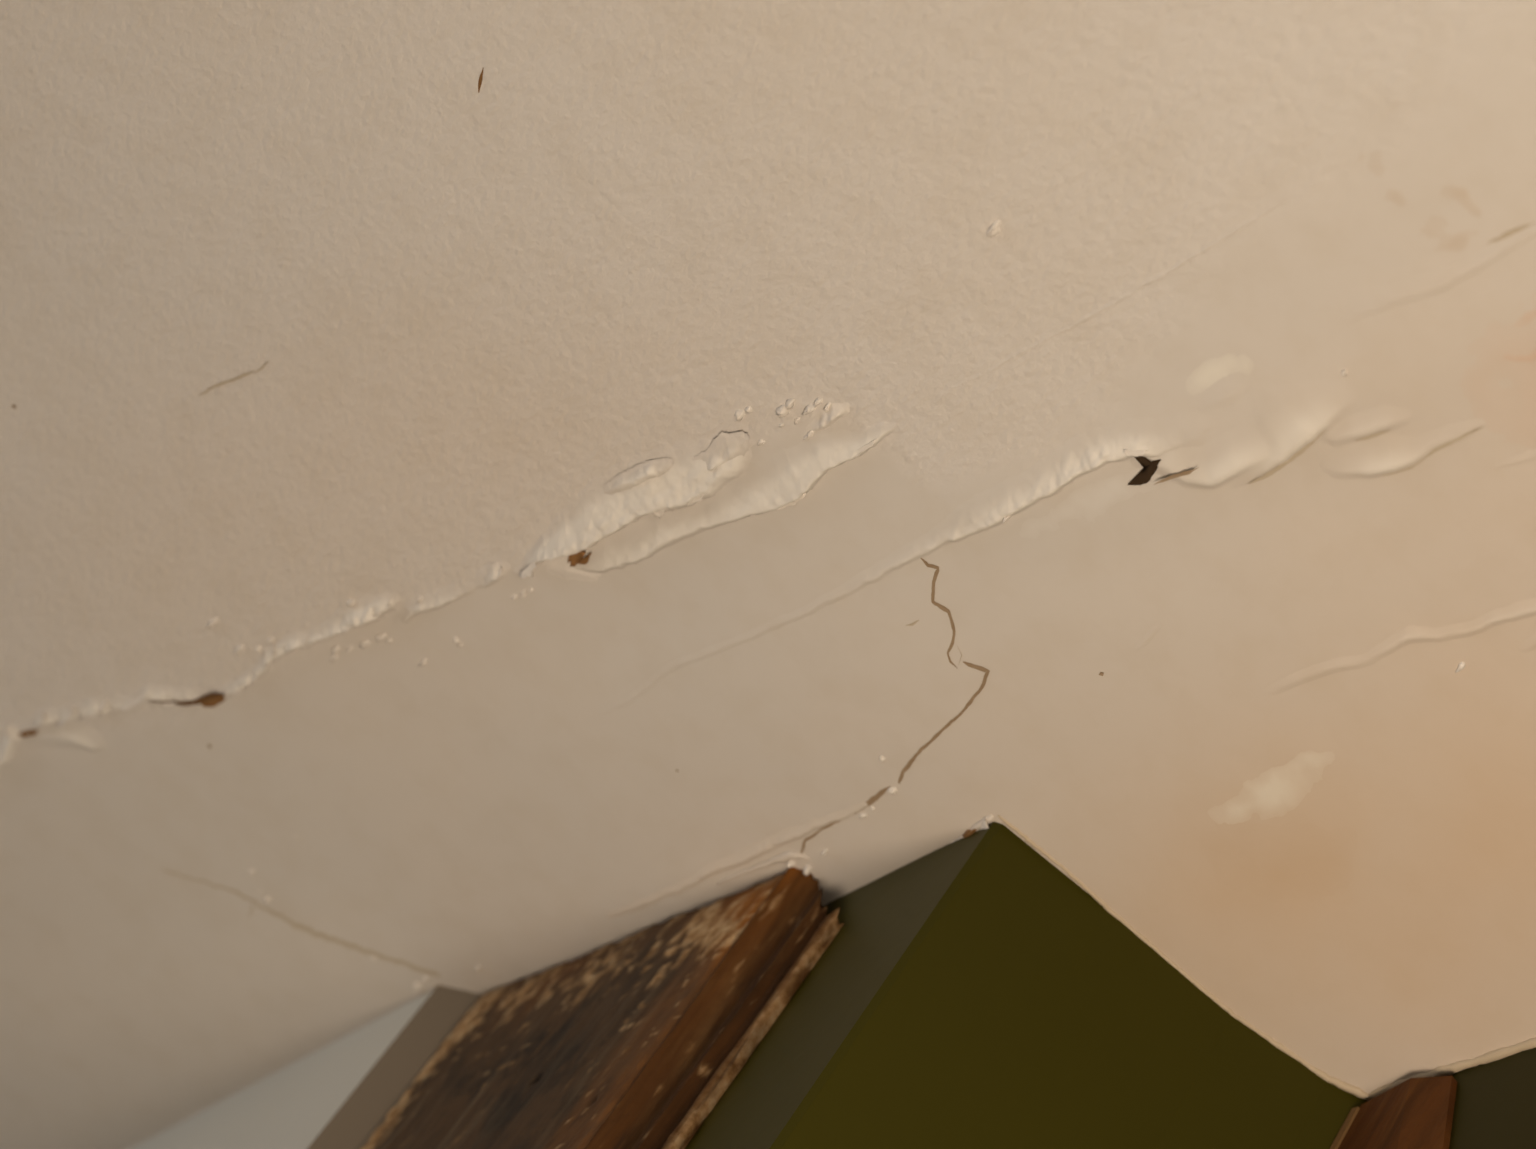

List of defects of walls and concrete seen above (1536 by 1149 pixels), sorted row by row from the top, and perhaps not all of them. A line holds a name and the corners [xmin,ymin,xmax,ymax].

peeling [0,561,534,772]
crack [801,558,990,853]
peeling [589,369,1486,717]